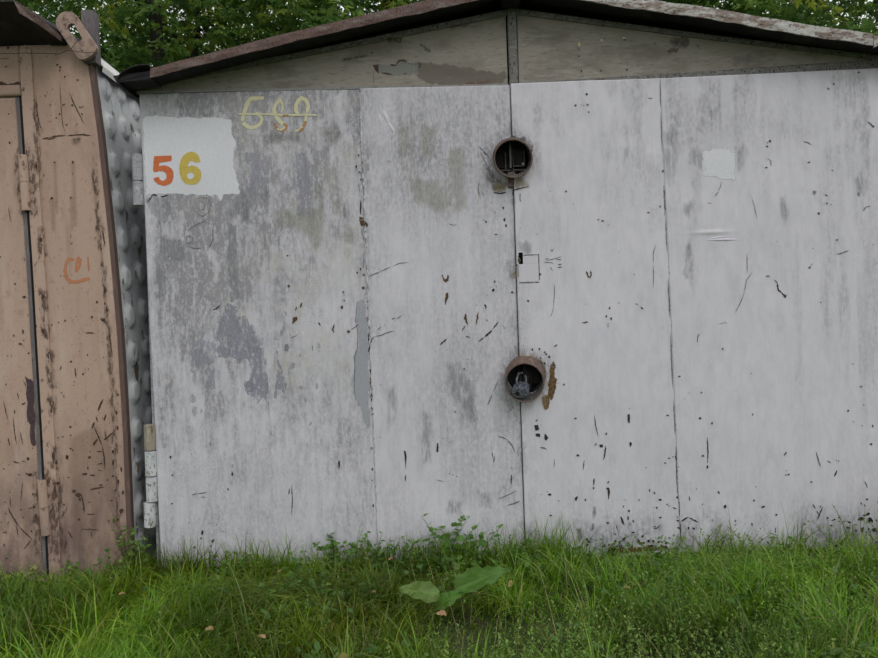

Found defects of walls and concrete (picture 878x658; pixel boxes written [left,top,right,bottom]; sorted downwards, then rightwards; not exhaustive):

peeling [373,60,421,76]
peeling [355,129,369,241]
peeling [22,376,36,460]
peeling [191,304,296,401]
peeling [347,260,374,428]
rust [538,360,557,410]